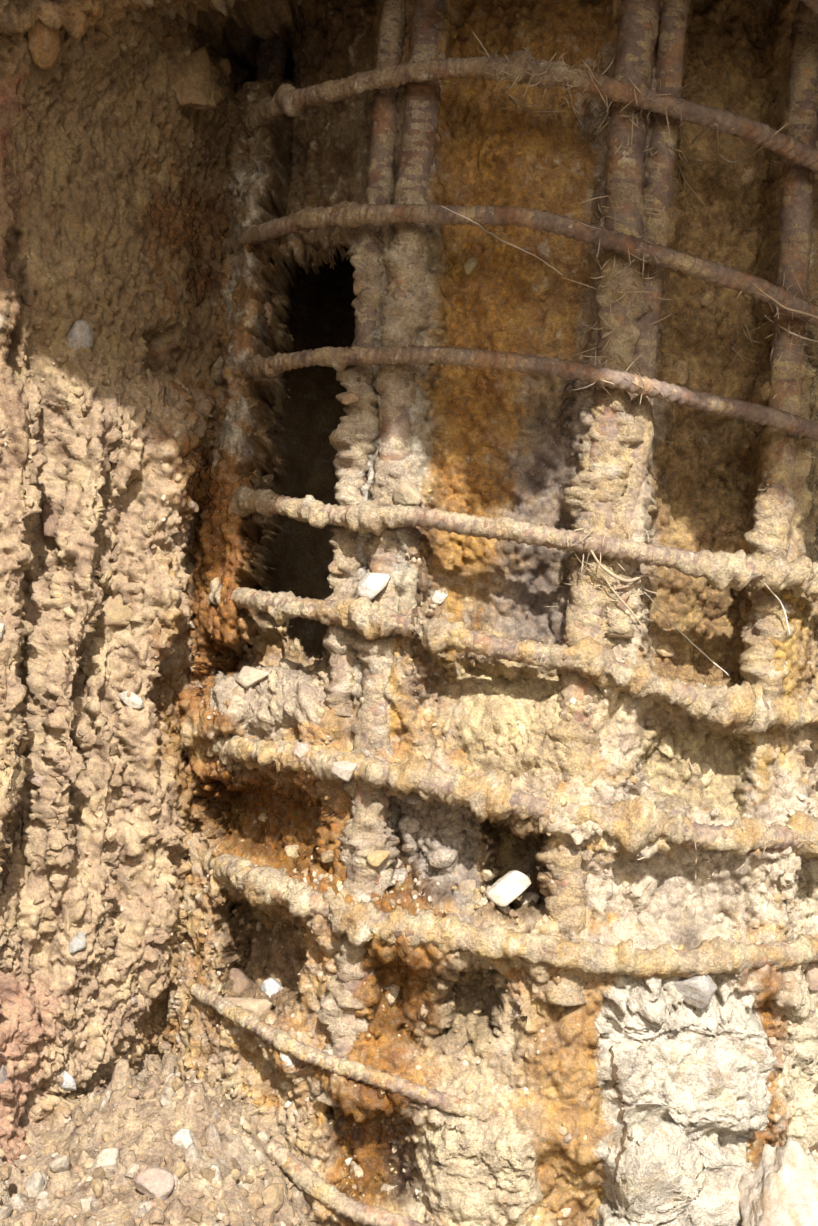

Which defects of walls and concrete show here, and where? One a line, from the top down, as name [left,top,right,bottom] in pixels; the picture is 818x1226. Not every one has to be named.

corrosion [429,364,502,517]
spalling [650,403,779,556]
corrosion [159,434,353,903]
spalling [648,567,753,687]
spalling [641,720,750,819]
corrosion [371,867,439,915]
spalling [387,798,555,918]
spalling [221,904,302,1013]
corrosion [349,934,434,1073]
spalling [419,961,499,1050]
corrosion [530,995,605,1226]
crack [808,1142,818,1153]